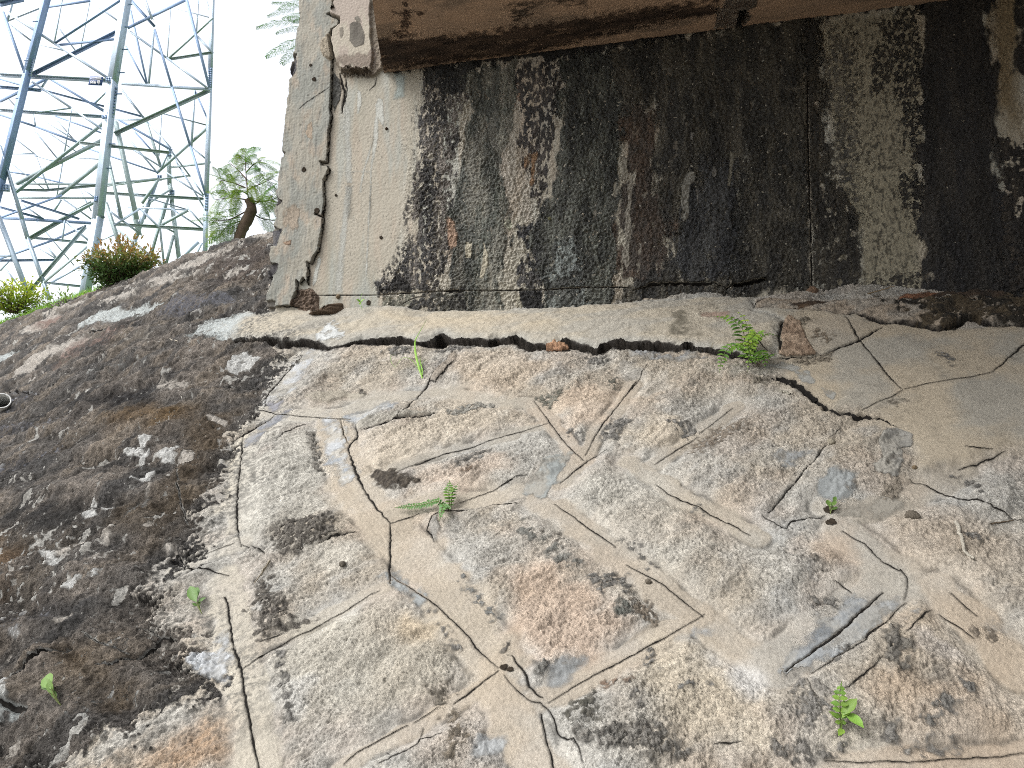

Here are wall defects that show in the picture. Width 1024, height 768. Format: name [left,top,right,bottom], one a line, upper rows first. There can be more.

crack [300,75,347,112]
spalling [346,64,370,76]
leakage [336,0,745,312]
leakage [792,0,1024,309]
crack [169,279,1023,768]